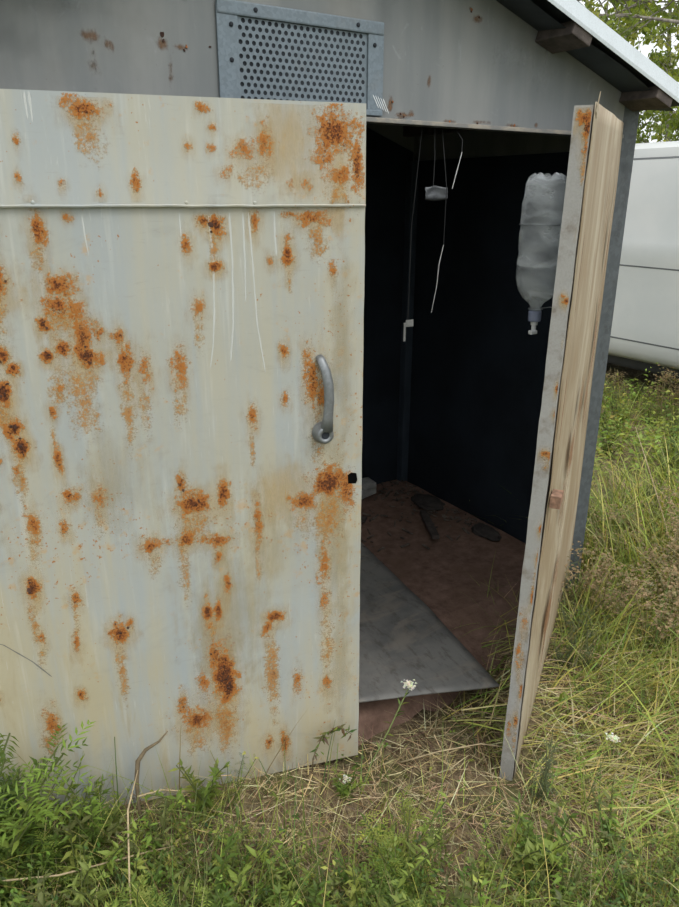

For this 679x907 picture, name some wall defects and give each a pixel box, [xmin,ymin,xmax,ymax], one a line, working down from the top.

corrosion [59,93,111,160]
corrosion [221,117,274,188]
corrosion [281,103,365,256]
corrosion [267,233,294,266]
corrosion [0,346,36,494]
corrosion [28,211,154,441]
corrosion [302,341,324,417]
corrosion [24,505,41,561]
corrosion [139,474,231,599]
corrosion [285,438,356,688]
corrosion [108,616,133,695]
corrosion [177,595,246,752]